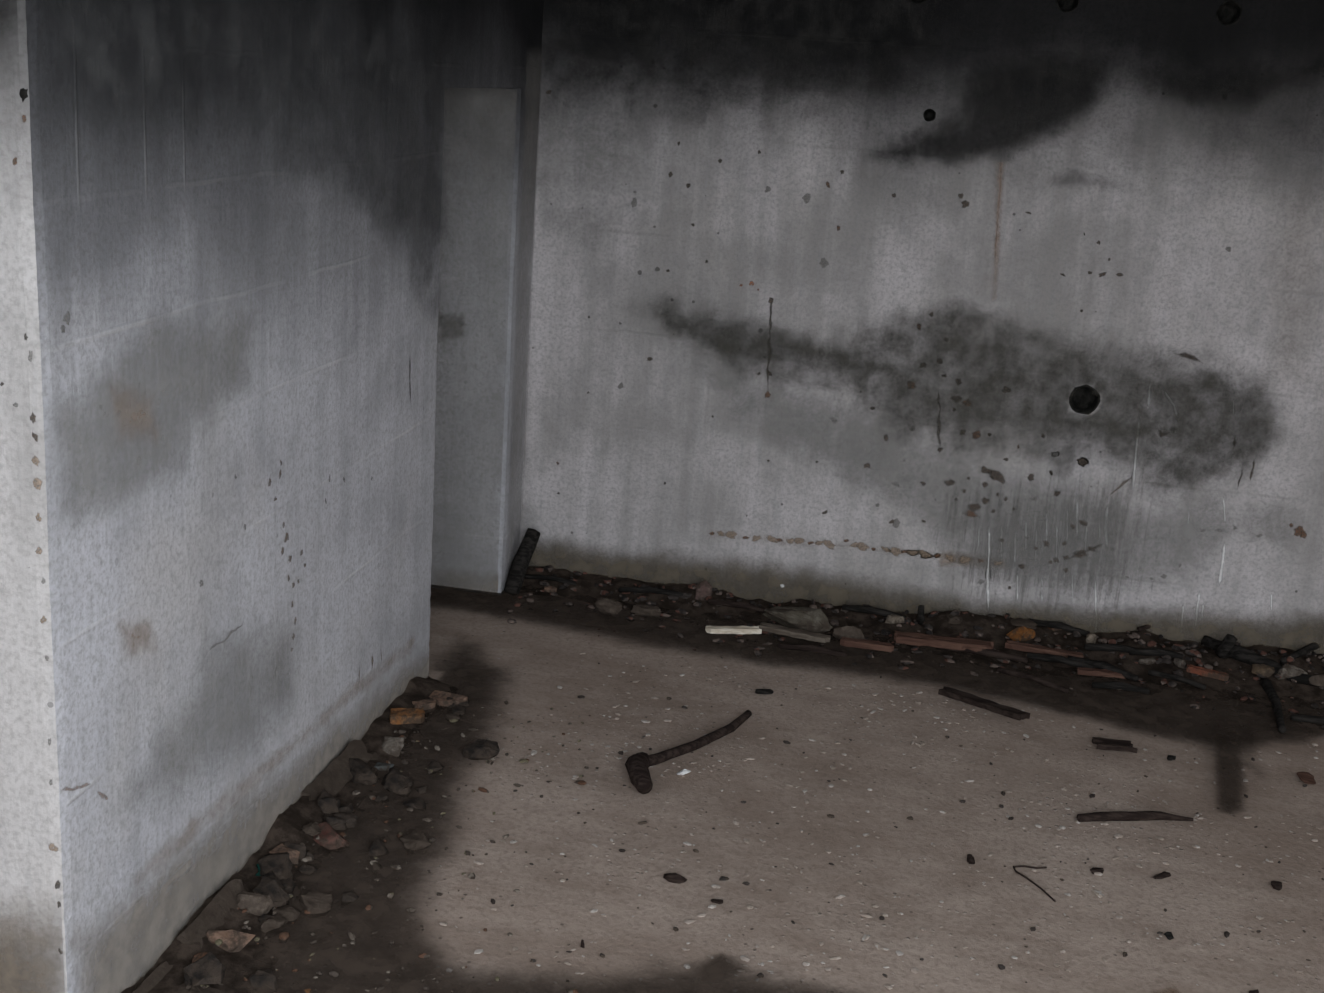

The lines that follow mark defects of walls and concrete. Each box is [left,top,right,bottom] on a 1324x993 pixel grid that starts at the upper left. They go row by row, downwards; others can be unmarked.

leakage [661,297,1269,487]
rust [709,531,1004,565]